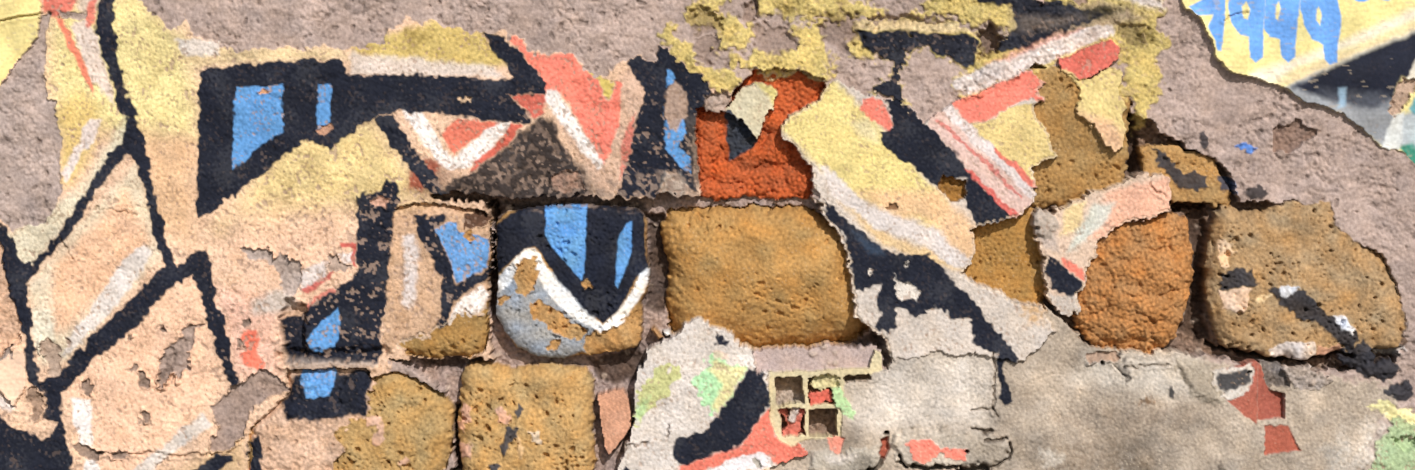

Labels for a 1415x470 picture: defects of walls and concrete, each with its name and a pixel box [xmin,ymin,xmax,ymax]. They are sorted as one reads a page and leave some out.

peeling [664,82,689,131]
spalling [1273,118,1318,154]
spalling [0,10,88,423]
spalling [938,175,968,202]
peeling [1071,149,1230,316]
peeling [242,244,303,296]
peeling [396,256,644,357]
peeling [1217,239,1359,360]
crack [1113,364,1170,380]
crack [1204,339,1356,367]
peeling [489,404,543,470]
crack [866,352,1014,470]